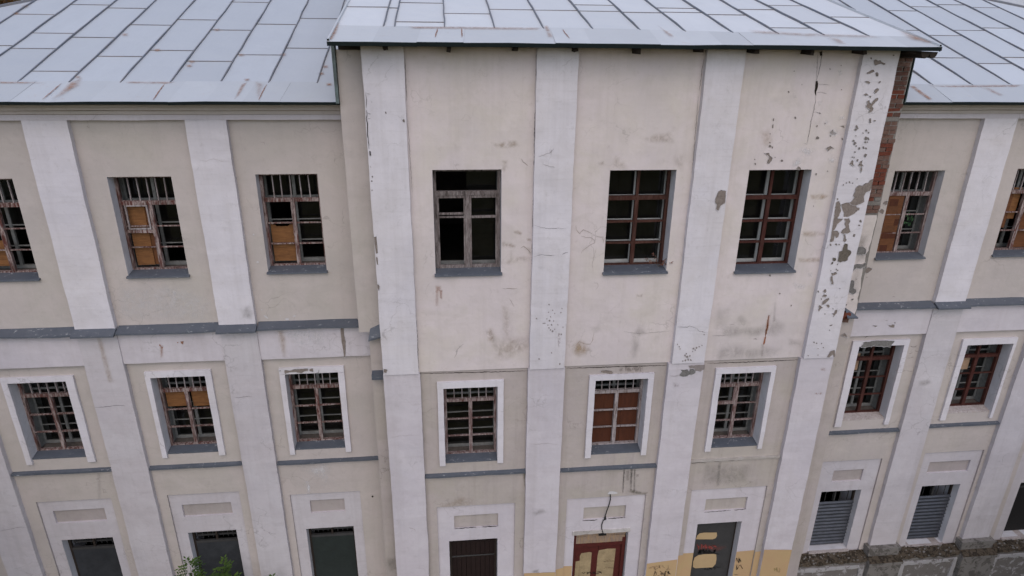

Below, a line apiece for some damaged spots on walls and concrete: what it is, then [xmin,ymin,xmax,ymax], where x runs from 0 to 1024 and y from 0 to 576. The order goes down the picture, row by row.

crack [804,51,826,144]
spalling [715,190,726,211]
flaking render [816,55,913,331]
crack [532,219,604,284]
spalling [677,331,724,377]